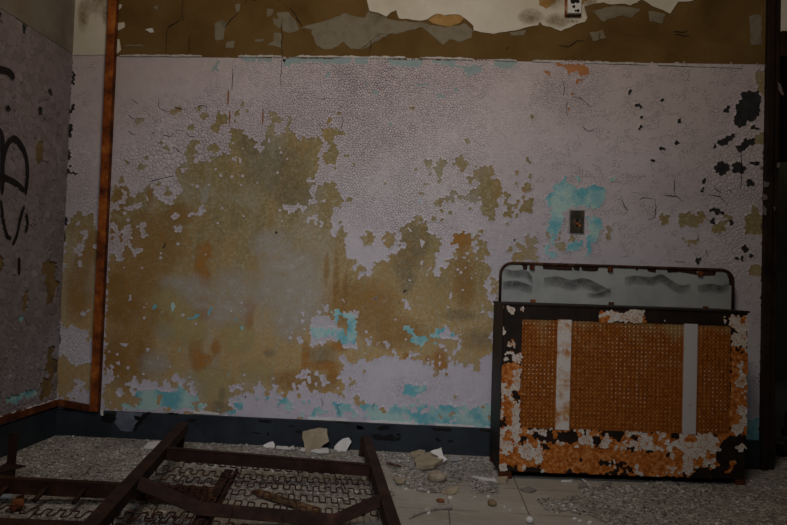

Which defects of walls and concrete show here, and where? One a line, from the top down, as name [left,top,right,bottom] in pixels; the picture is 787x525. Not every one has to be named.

crack [279,0,305,83]
peeling [26,132,50,176]
flaking render [117,0,775,280]
peeling [100,99,618,473]
peeling [599,309,645,324]
peeling [724,314,759,452]
peeling [556,429,722,477]